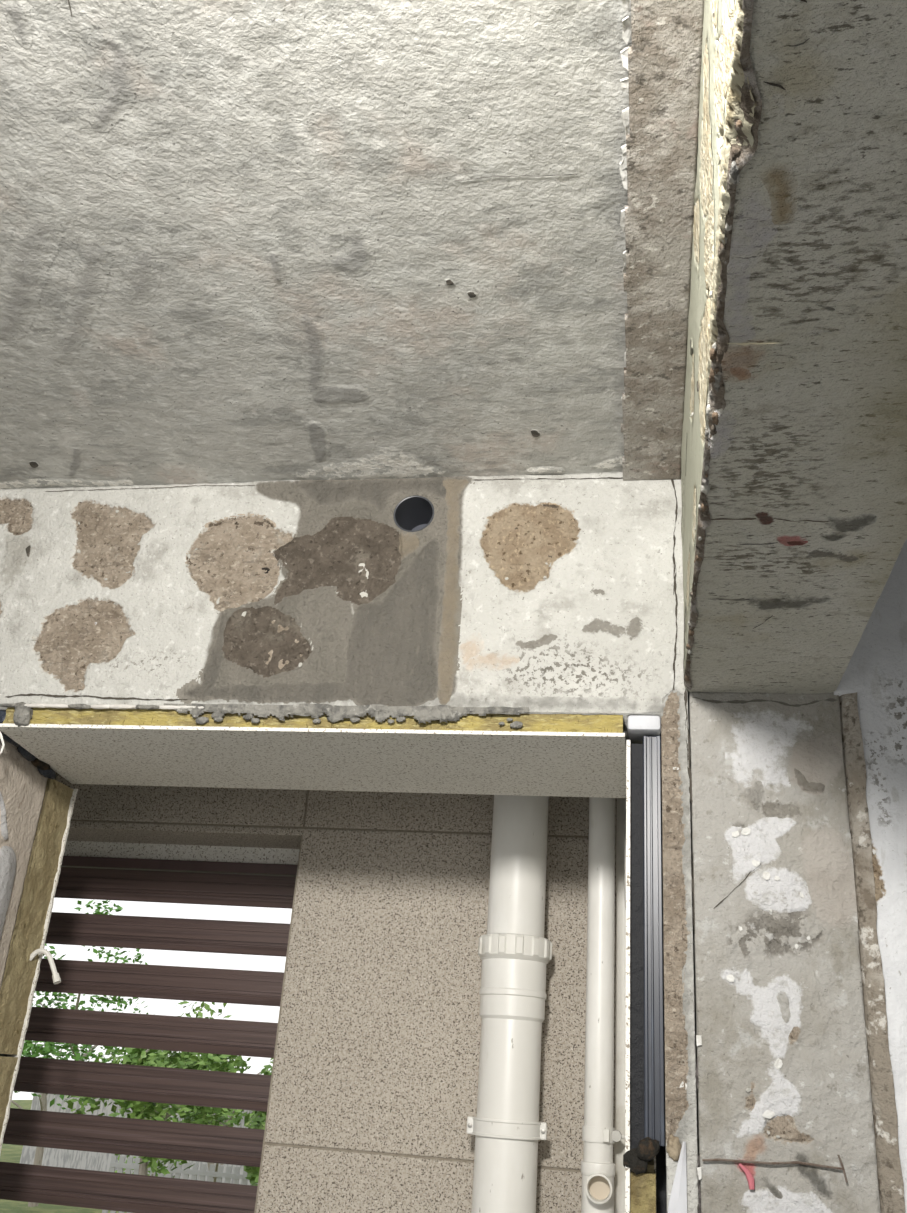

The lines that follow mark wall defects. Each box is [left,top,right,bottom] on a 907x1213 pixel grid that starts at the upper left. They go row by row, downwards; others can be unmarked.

spalling [444,278,478,299]
flaking render [0,492,38,557]
flaking render [29,495,204,696]
flaking render [182,510,402,678]
spalling [475,0,907,1151]